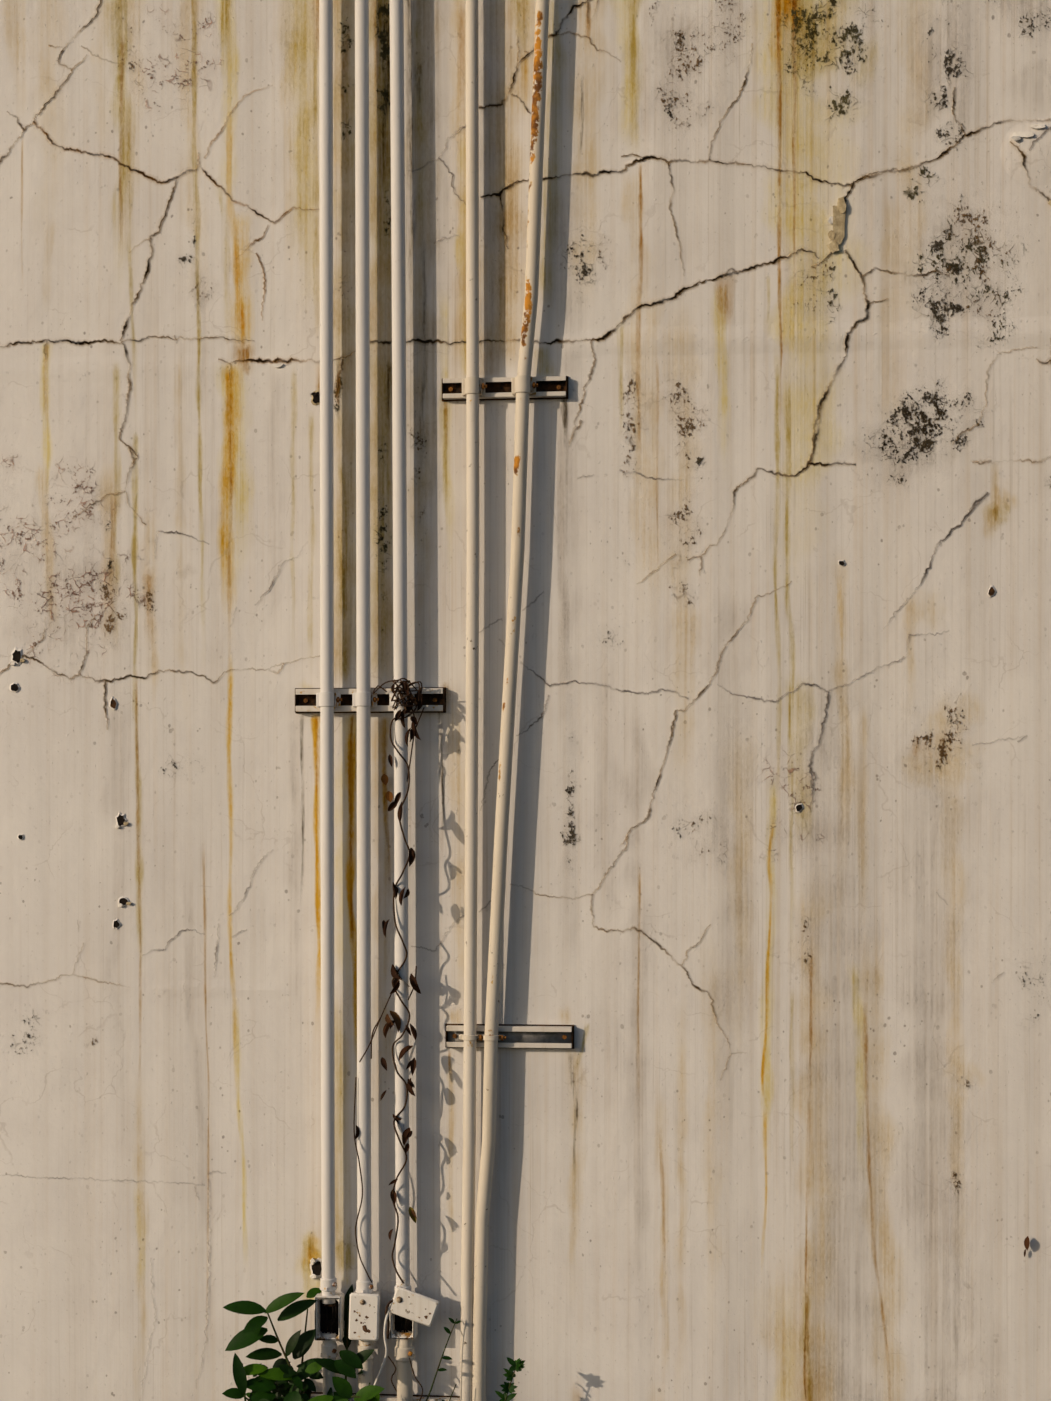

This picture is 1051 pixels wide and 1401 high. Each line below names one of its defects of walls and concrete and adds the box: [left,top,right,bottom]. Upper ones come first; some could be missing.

water stain [657,0,745,129]
water stain [776,0,882,119]
crack [0,0,315,537]
crack [334,0,1051,579]
water stain [913,194,1022,353]
water stain [868,380,985,484]
water stain [0,464,156,657]
crack [859,427,988,678]
crack [0,618,284,725]
crack [527,595,829,1016]
water stain [911,698,966,767]